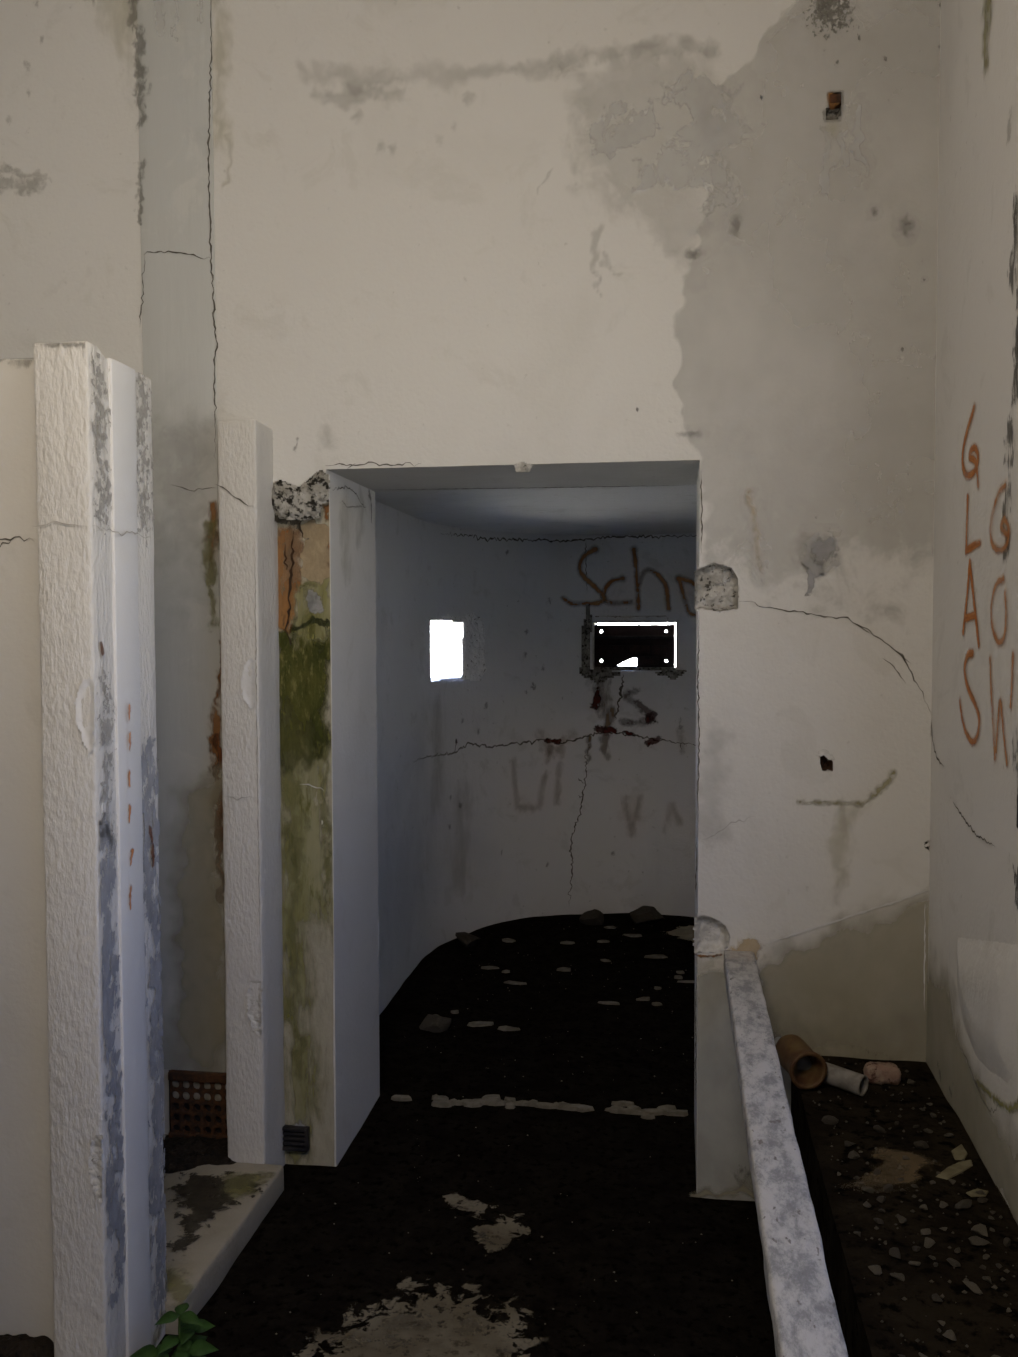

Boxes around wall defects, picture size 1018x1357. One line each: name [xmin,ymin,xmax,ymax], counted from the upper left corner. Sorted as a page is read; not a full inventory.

mould [803,0,860,40]
crack [139,11,218,452]
crack [0,521,150,547]
spalling [272,470,330,638]
spalling [693,563,739,613]
flaking render [282,640,334,1167]
crack [415,633,753,901]
crack [745,601,944,767]
crack [953,802,994,846]
leakage [759,901,1018,1225]